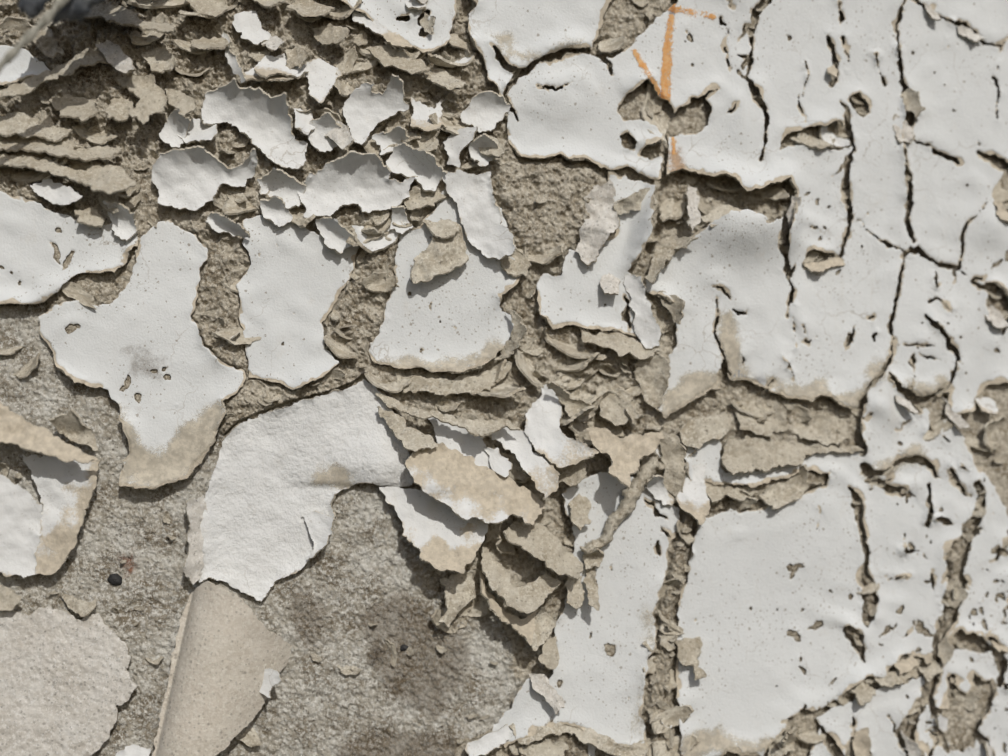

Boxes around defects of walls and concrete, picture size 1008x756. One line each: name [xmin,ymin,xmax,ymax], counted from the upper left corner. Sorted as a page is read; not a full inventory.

crack [719,0,772,161]
spalling [780,93,870,160]
spalling [0,0,804,756]
crack [713,285,747,384]
peeling [663,379,864,475]
crack [777,215,812,343]
peeling [802,226,845,275]
crack [787,0,1008,756]
spalling [895,382,1008,516]
crack [644,499,669,556]
spalling [850,569,1008,756]
spalling [764,704,827,756]